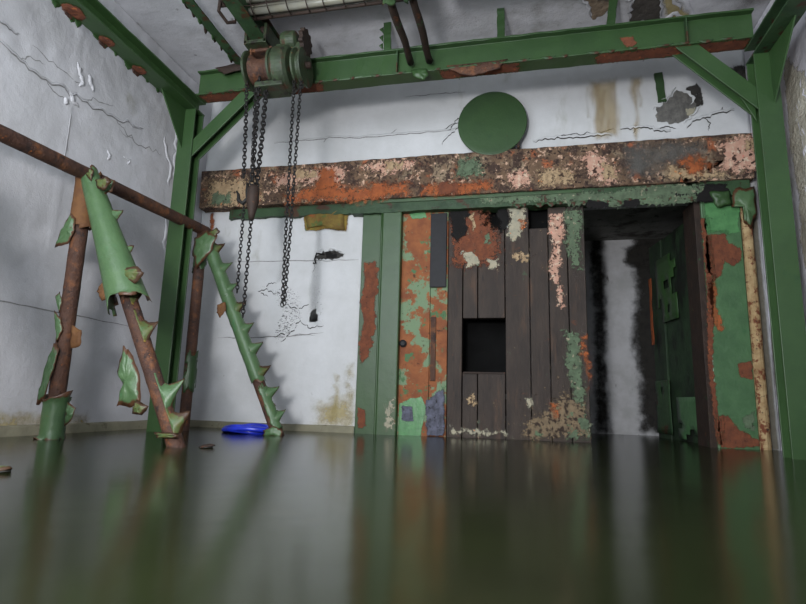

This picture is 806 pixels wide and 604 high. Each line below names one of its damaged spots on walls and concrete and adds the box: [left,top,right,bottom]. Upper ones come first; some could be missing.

flaking render [582,0,609,20]
flaking render [627,0,696,22]
crack [0,20,159,156]
flaking render [653,83,703,124]
flaking render [784,58,806,267]
rust [285,167,411,231]
rust [421,179,491,197]
rust [358,261,379,362]
rust [357,407,366,428]